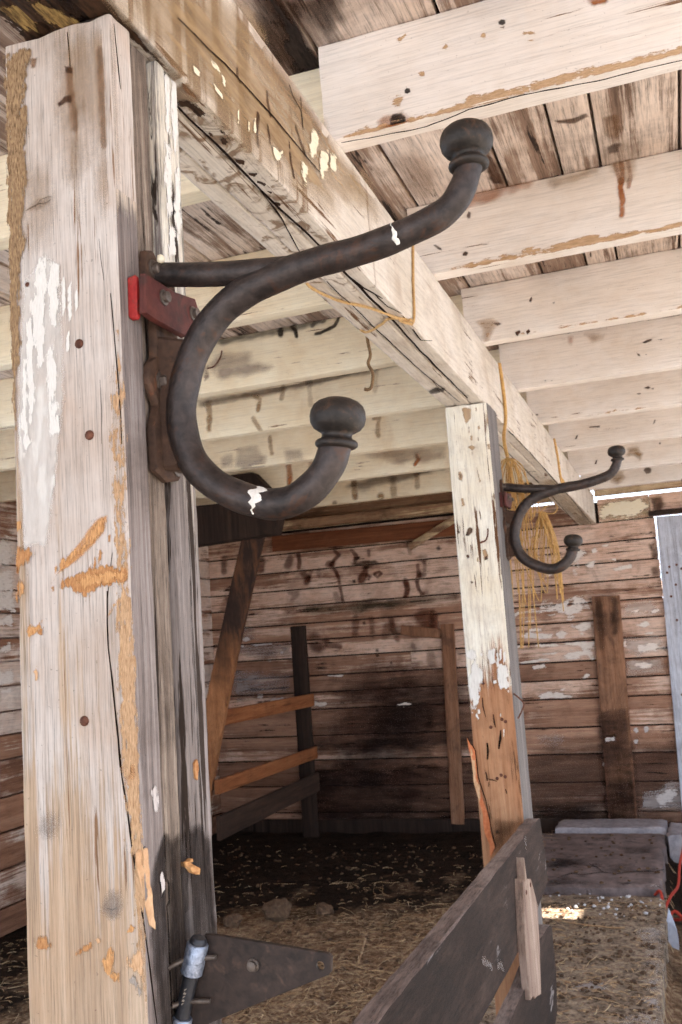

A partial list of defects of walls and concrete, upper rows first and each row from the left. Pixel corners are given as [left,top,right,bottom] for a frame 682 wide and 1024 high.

peeling [341,46,682,143]
peeling [301,129,337,186]
peeling [451,222,682,270]
peeling [0,252,78,626]
spalling [51,517,128,597]
peeling [0,668,14,693]
crack [107,557,145,868]
peeling [466,596,595,719]
crack [140,906,157,1024]